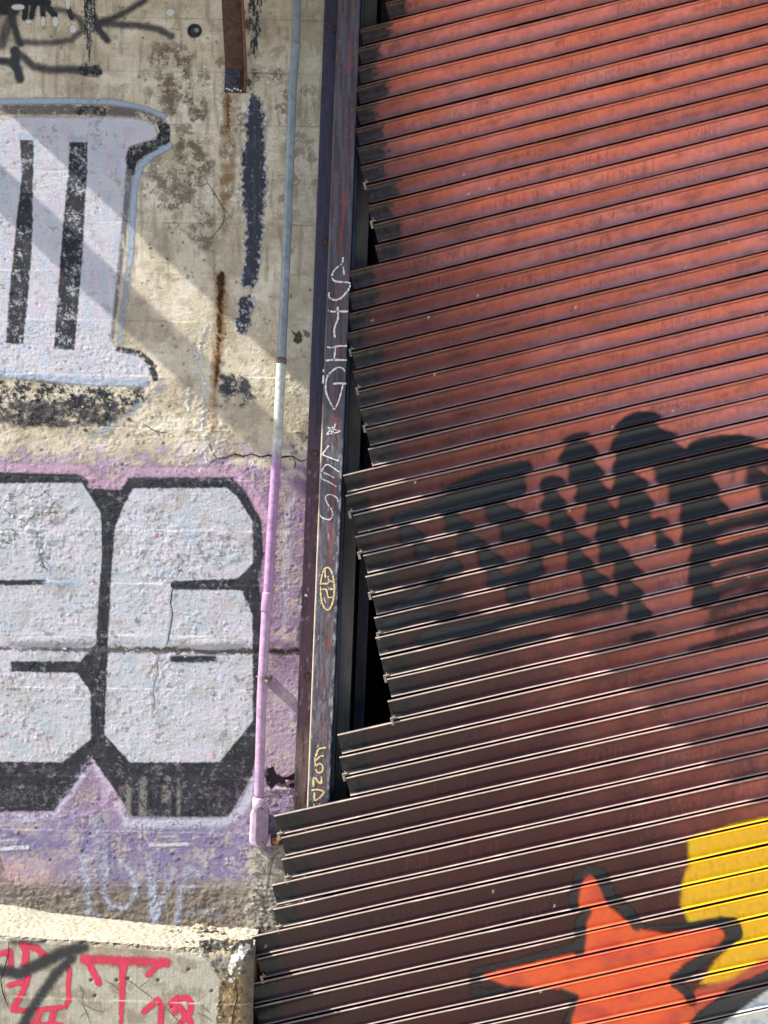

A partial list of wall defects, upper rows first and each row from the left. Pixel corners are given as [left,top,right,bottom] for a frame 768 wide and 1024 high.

rust [212,272,226,406]
crack [208,444,307,468]